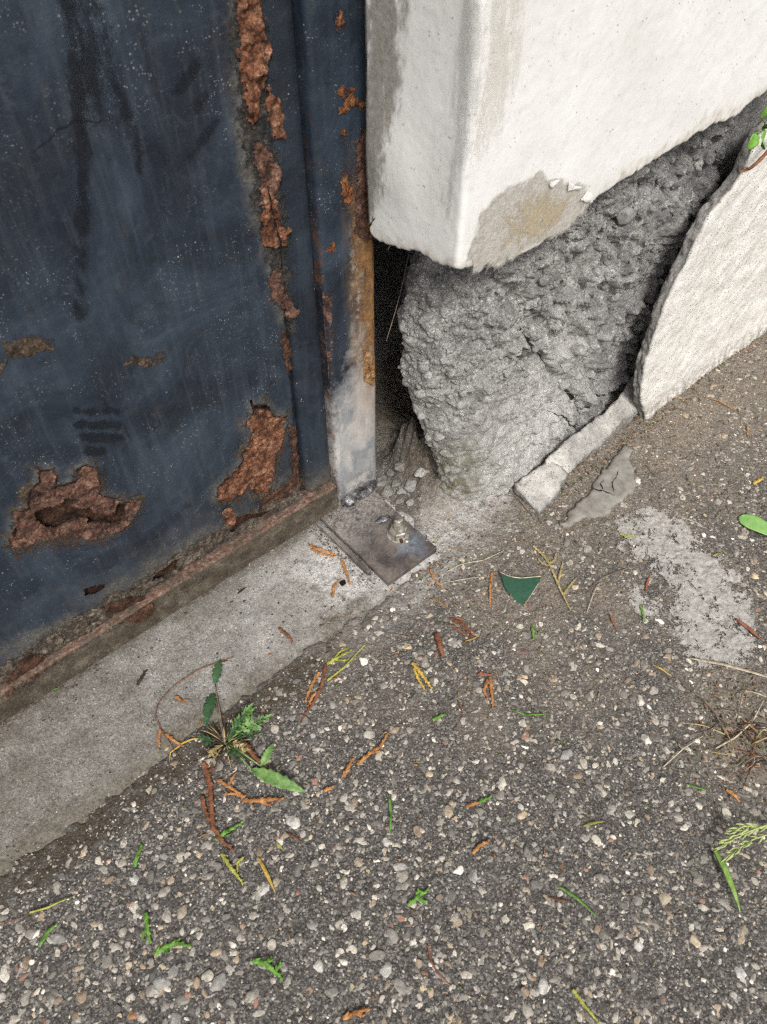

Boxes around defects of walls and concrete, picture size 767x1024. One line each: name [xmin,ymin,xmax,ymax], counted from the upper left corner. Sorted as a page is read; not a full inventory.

corrosion [0,334,55,374]
corrosion [227,0,300,373]
corrosion [337,85,366,115]
corrosion [339,127,375,386]
spalling [397,90,767,501]
corrosion [0,395,304,699]